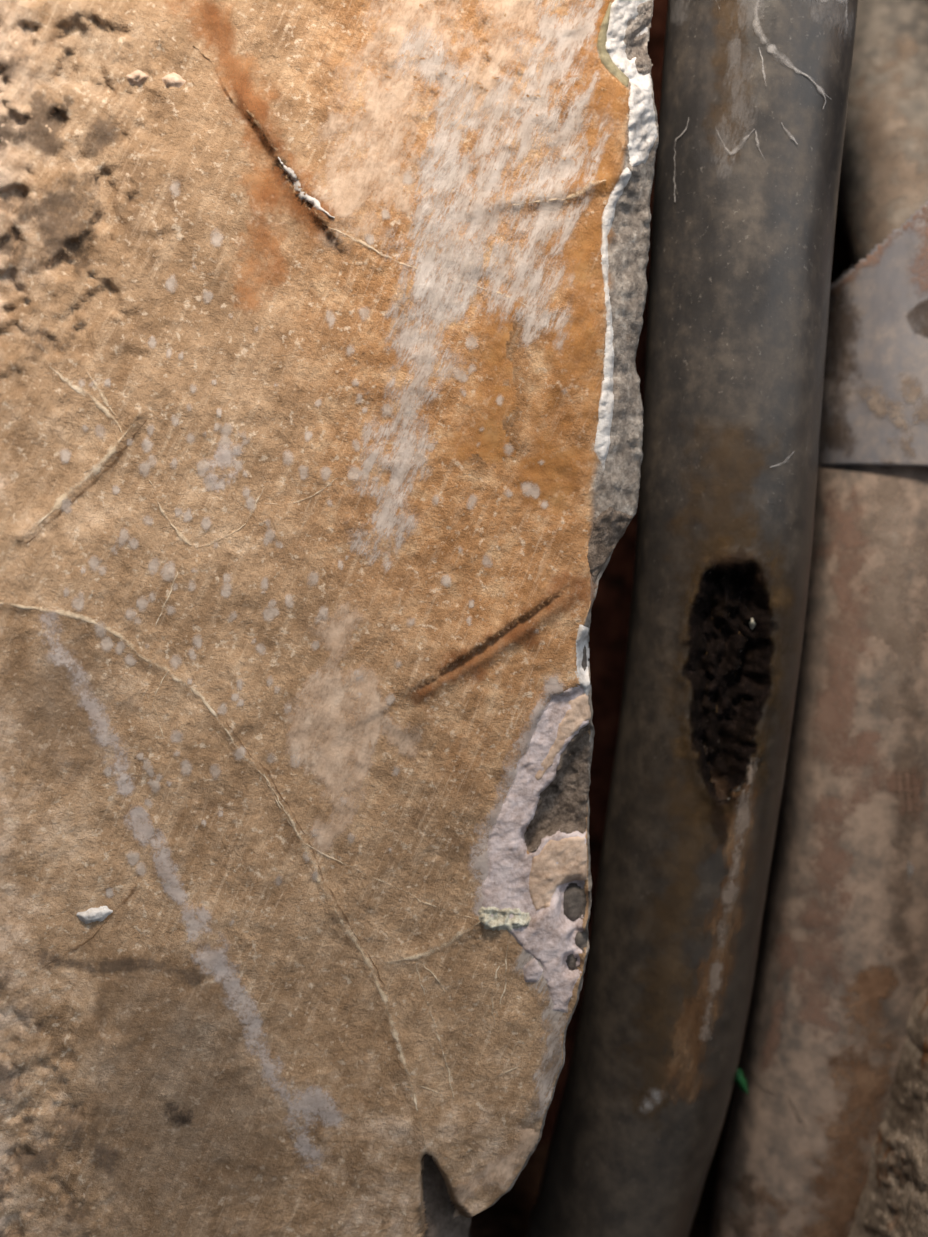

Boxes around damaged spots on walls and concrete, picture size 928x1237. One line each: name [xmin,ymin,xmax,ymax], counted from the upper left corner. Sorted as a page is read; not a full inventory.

rust [196,5,329,307]
crack [193,46,527,306]
leakage [351,0,608,565]
flaking render [594,0,658,471]
crack [27,366,146,543]
rust [415,614,536,700]
rust [520,438,582,496]
flaking render [587,507,633,585]
leakage [129,807,210,938]
crack [0,603,480,1176]
peeling [472,625,591,1115]
leakage [182,949,341,1167]